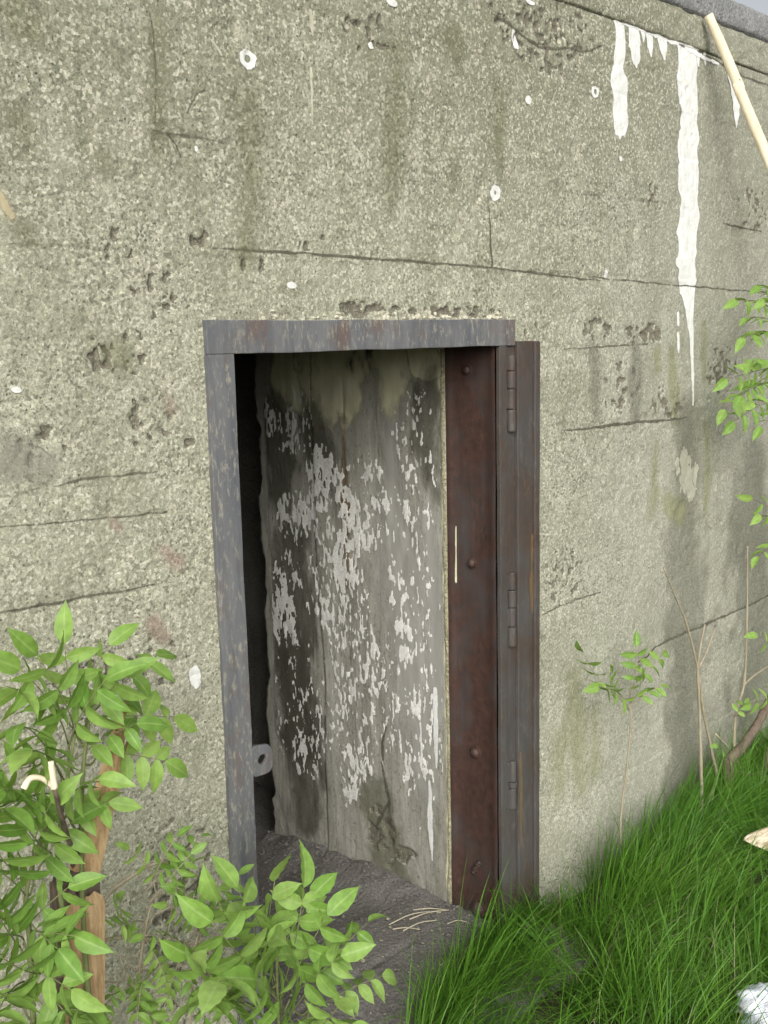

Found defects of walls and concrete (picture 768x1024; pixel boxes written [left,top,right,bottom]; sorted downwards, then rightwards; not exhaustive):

spalling [488,0,594,75]
crack [150,18,226,157]
damp [728,76,740,128]
crack [213,206,766,293]
damp [610,20,719,405]
crack [568,416,687,431]
crack [37,471,158,489]
crack [3,511,167,527]
crack [0,584,154,613]
peeling [264,382,446,809]